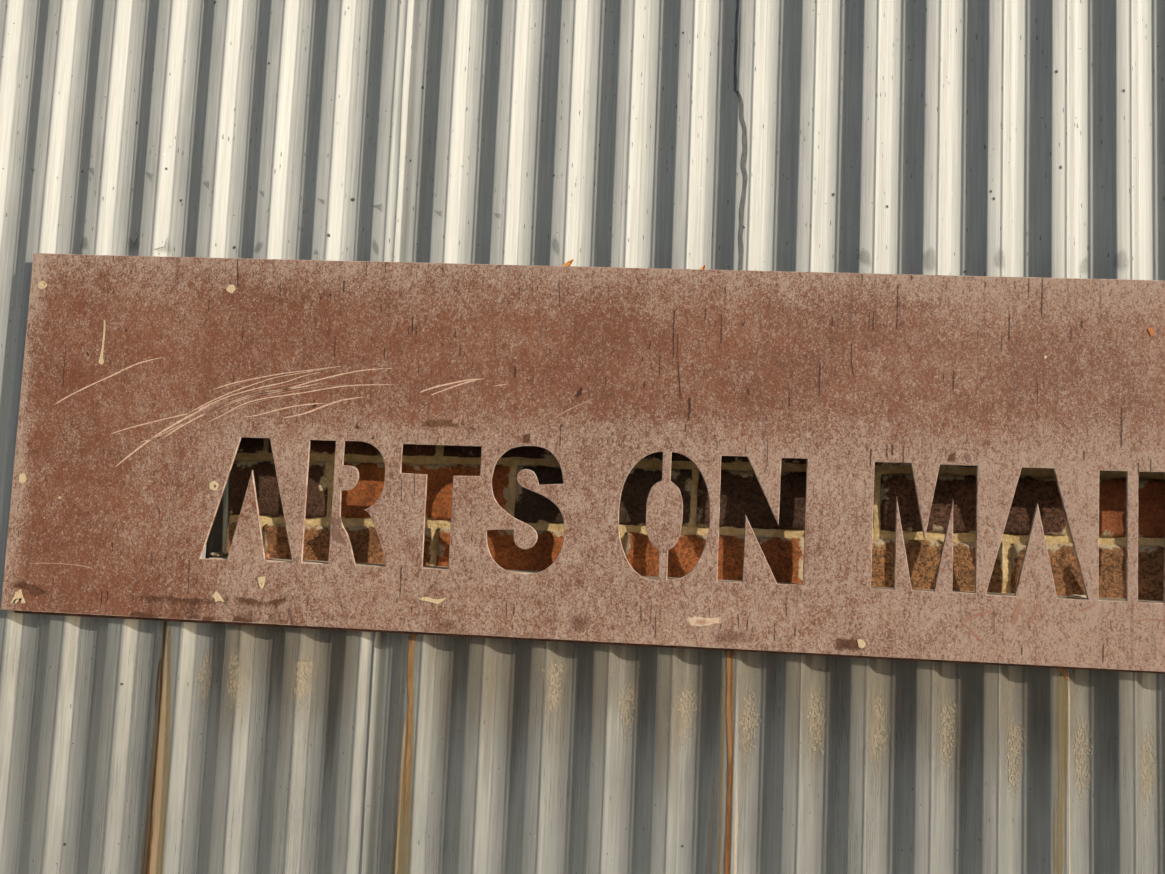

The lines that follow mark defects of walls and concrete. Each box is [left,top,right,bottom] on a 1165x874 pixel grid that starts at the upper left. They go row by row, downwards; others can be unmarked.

crack [734,0,748,270]
corrosion [141,621,171,874]
corrosion [394,634,416,874]
corrosion [718,651,734,874]